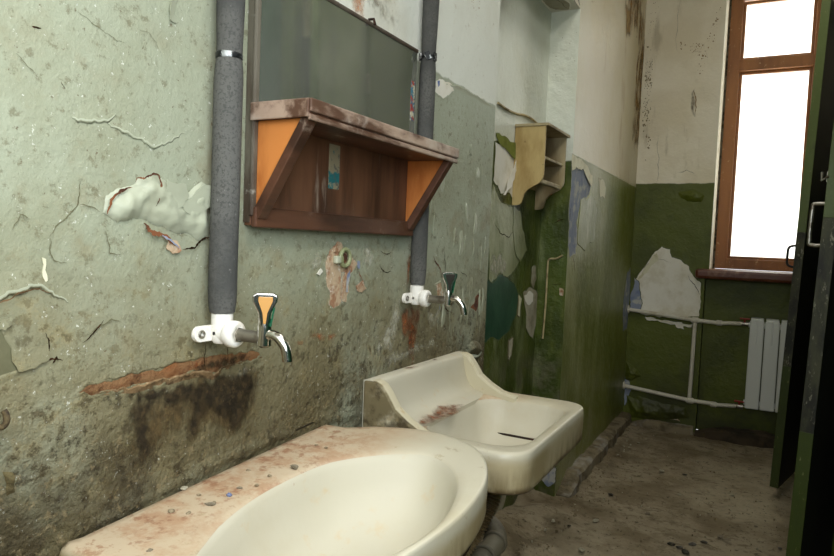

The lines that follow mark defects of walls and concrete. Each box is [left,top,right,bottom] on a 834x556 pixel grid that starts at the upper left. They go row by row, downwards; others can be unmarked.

damp [626,0,657,149]
peeling [0,258,71,303]
peeling [316,239,366,310]
peeling [469,133,538,360]
peeling [568,153,636,268]
peeling [622,245,703,332]
peeling [0,317,23,384]
rust [75,343,262,400]
damp [131,373,256,464]